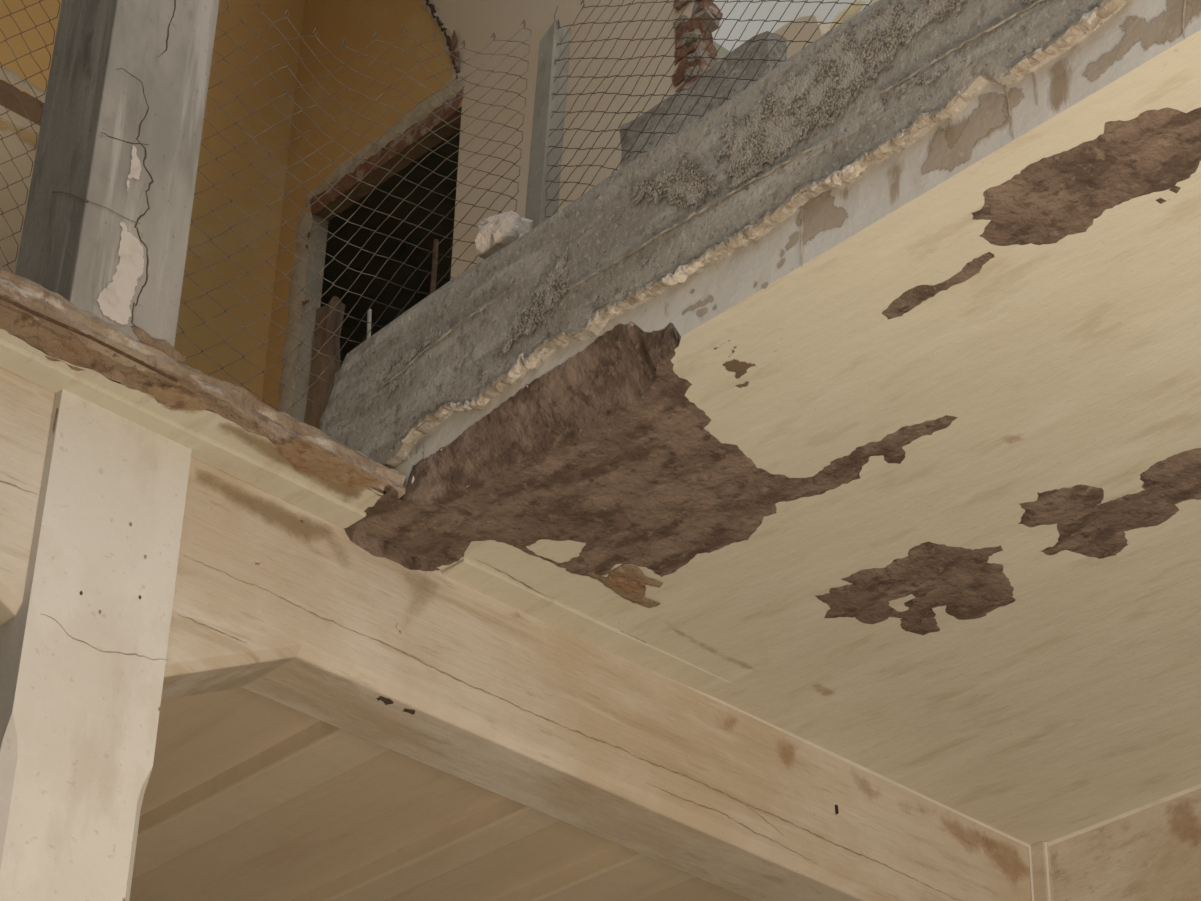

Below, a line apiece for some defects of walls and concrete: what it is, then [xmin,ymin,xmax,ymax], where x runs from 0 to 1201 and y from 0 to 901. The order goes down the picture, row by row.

crack [158,0,176,57]
spalling [671,0,723,93]
peeling [1082,0,1193,82]
peeling [921,87,1024,174]
crack [101,68,154,327]
peeling [777,190,848,268]
peeling [882,107,1201,319]
peeling [0,222,958,608]
peeling [1018,448,1201,559]
peeling [815,542,1016,635]
crack [42,614,166,660]
crack [179,555,962,901]